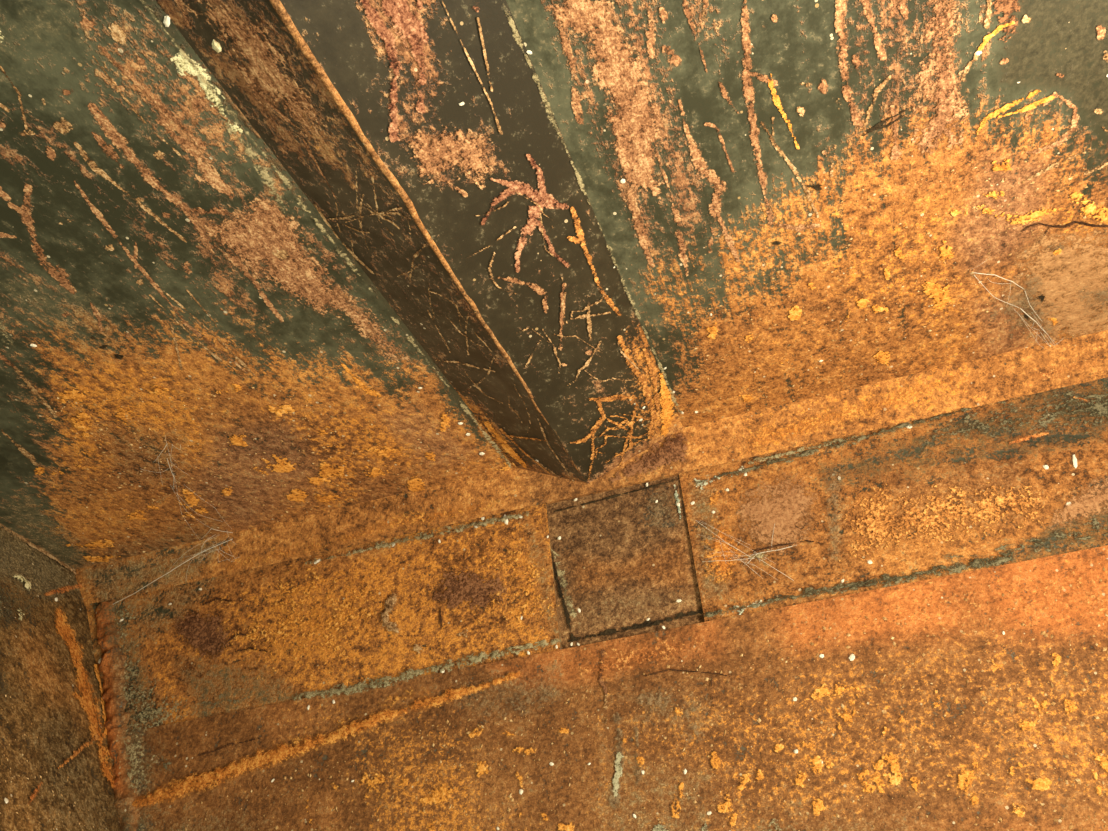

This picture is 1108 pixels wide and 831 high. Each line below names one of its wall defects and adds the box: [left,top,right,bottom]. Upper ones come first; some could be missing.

peeling [170,52,285,213]
rust [53,0,410,373]
rust [360,0,621,355]
peeling [553,0,689,276]
rust [678,99,740,262]
peeling [890,105,902,160]
peeling [897,0,909,19]
peeling [911,0,969,154]
rust [1070,188,1108,222]
rust [570,335,674,479]
rust [55,608,114,788]
rust [863,752,903,793]